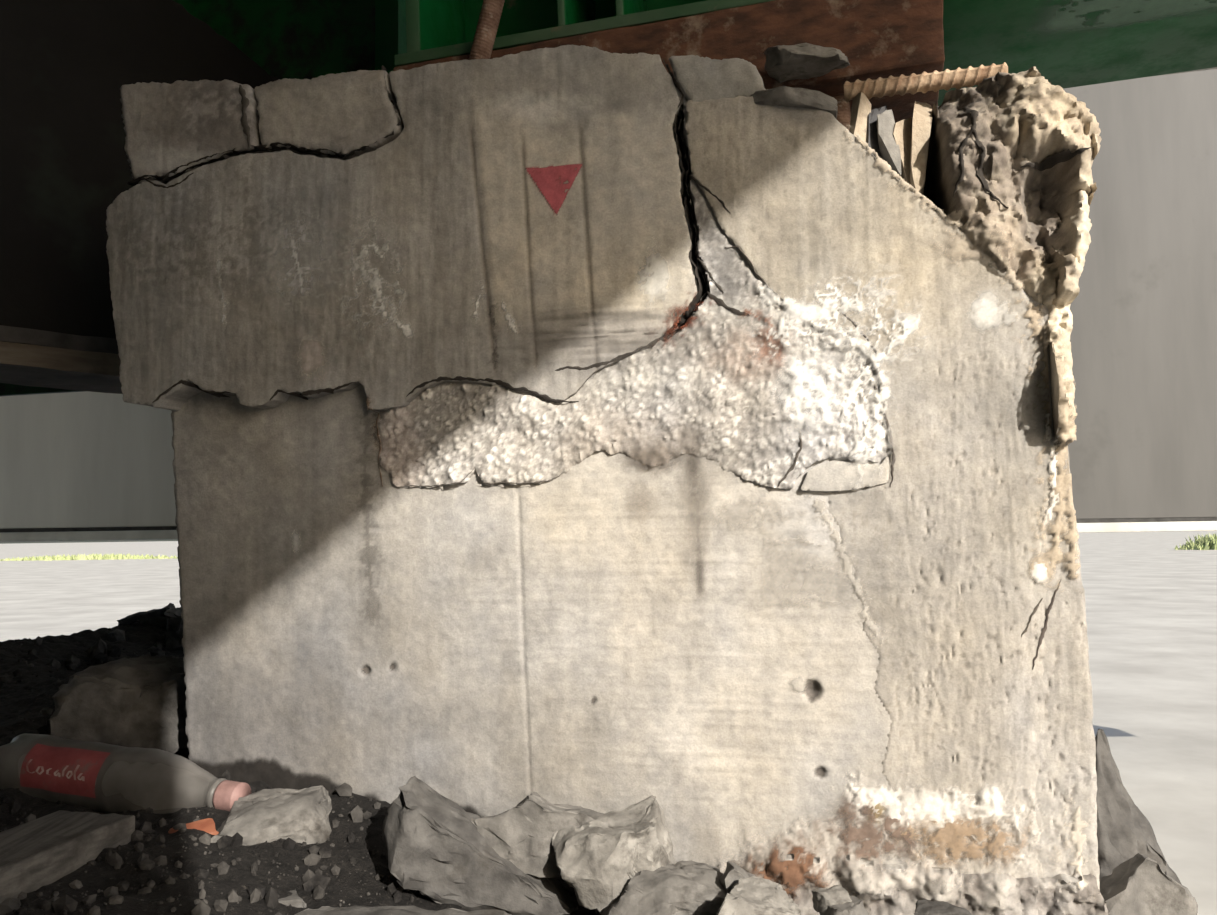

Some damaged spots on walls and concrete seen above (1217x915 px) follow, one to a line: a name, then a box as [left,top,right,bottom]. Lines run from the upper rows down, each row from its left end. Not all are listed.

crack [127,66,401,188]
spalling [749,43,1008,199]
water stain [350,226,414,337]
crack [406,59,784,403]
rust [665,303,699,343]
crack [269,382,356,401]
spalling [376,181,889,643]
crack [778,431,803,487]
crack [804,307,896,487]
crack [1022,579,1062,668]
rust [749,846,828,895]
rust [827,803,1025,865]